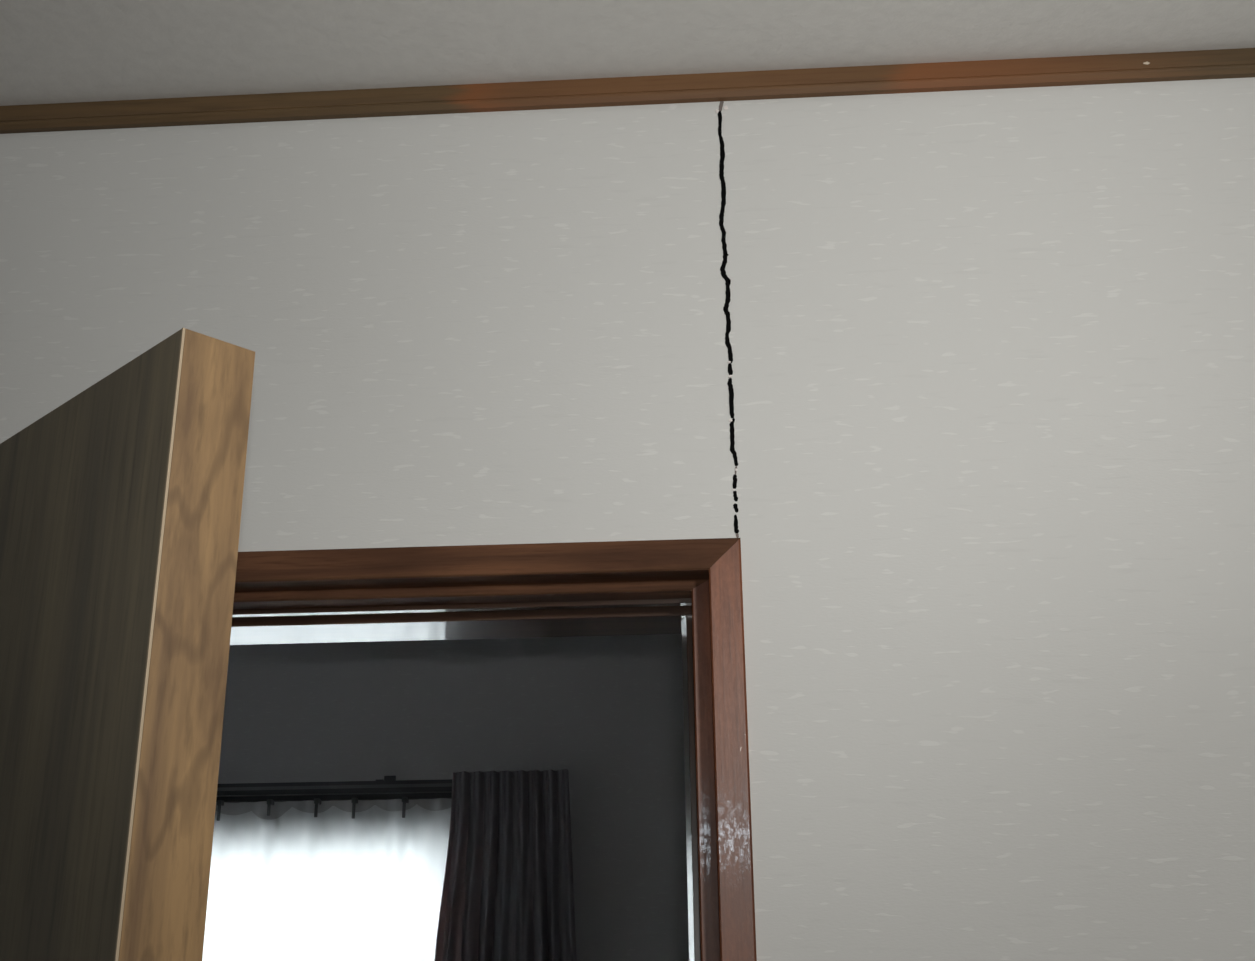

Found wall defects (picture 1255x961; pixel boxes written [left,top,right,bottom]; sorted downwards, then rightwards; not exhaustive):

crack [715,101,739,538]